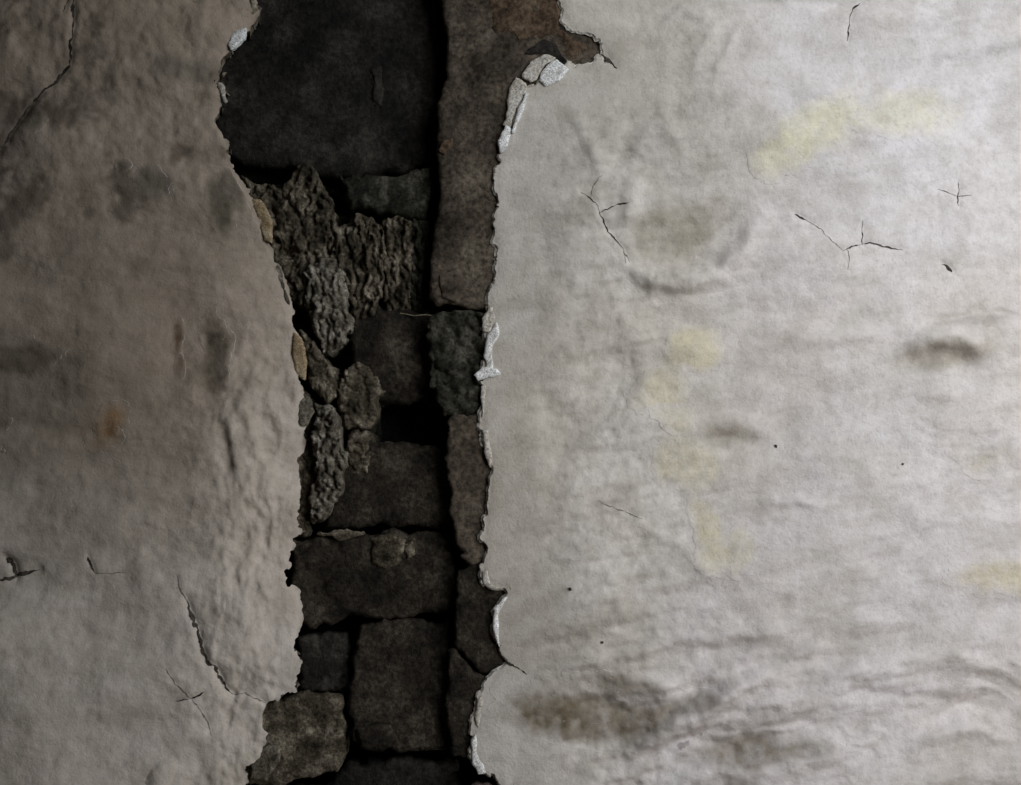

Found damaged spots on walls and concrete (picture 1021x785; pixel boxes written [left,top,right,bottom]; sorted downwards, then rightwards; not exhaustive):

peeling [228,28,247,51]
peeling [217,82,228,104]
peeling [252,199,273,244]
spalling [429,0,605,416]
crack [795,214,902,268]
peeling [292,333,308,381]
peeling [298,396,315,427]
peeling [482,430,493,467]
peeling [482,570,508,647]
peeling [471,697,486,774]
water stain [479,669,708,753]
water stain [653,723,860,785]